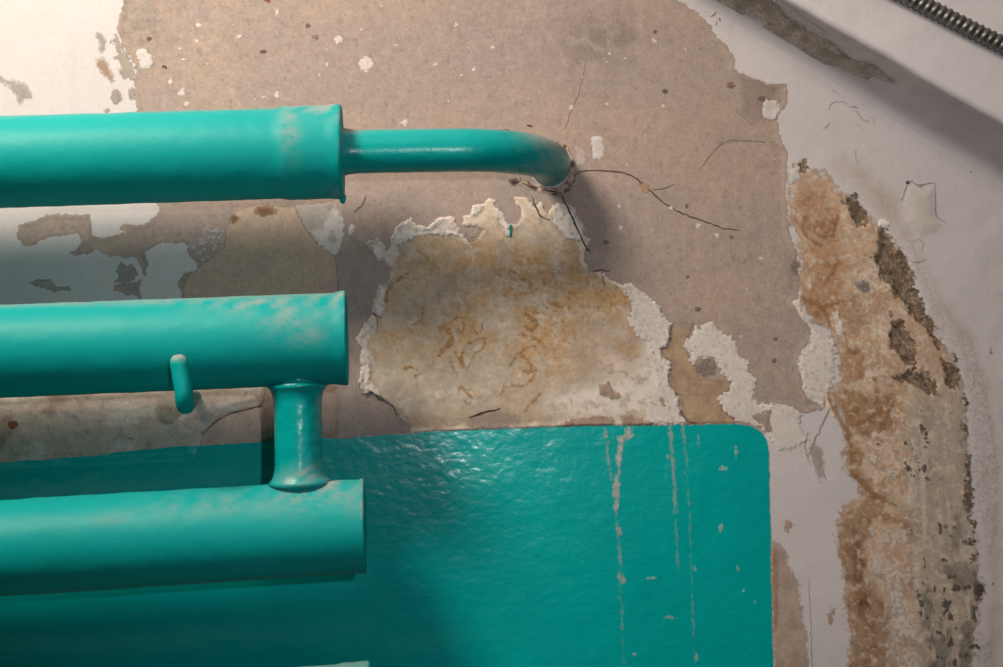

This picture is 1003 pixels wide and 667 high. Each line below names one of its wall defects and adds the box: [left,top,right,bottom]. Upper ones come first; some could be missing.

peeling [16,0,837,452]
crack [531,195,607,289]
crack [575,170,739,231]
damp [788,163,999,667]
peeling [770,542,809,667]